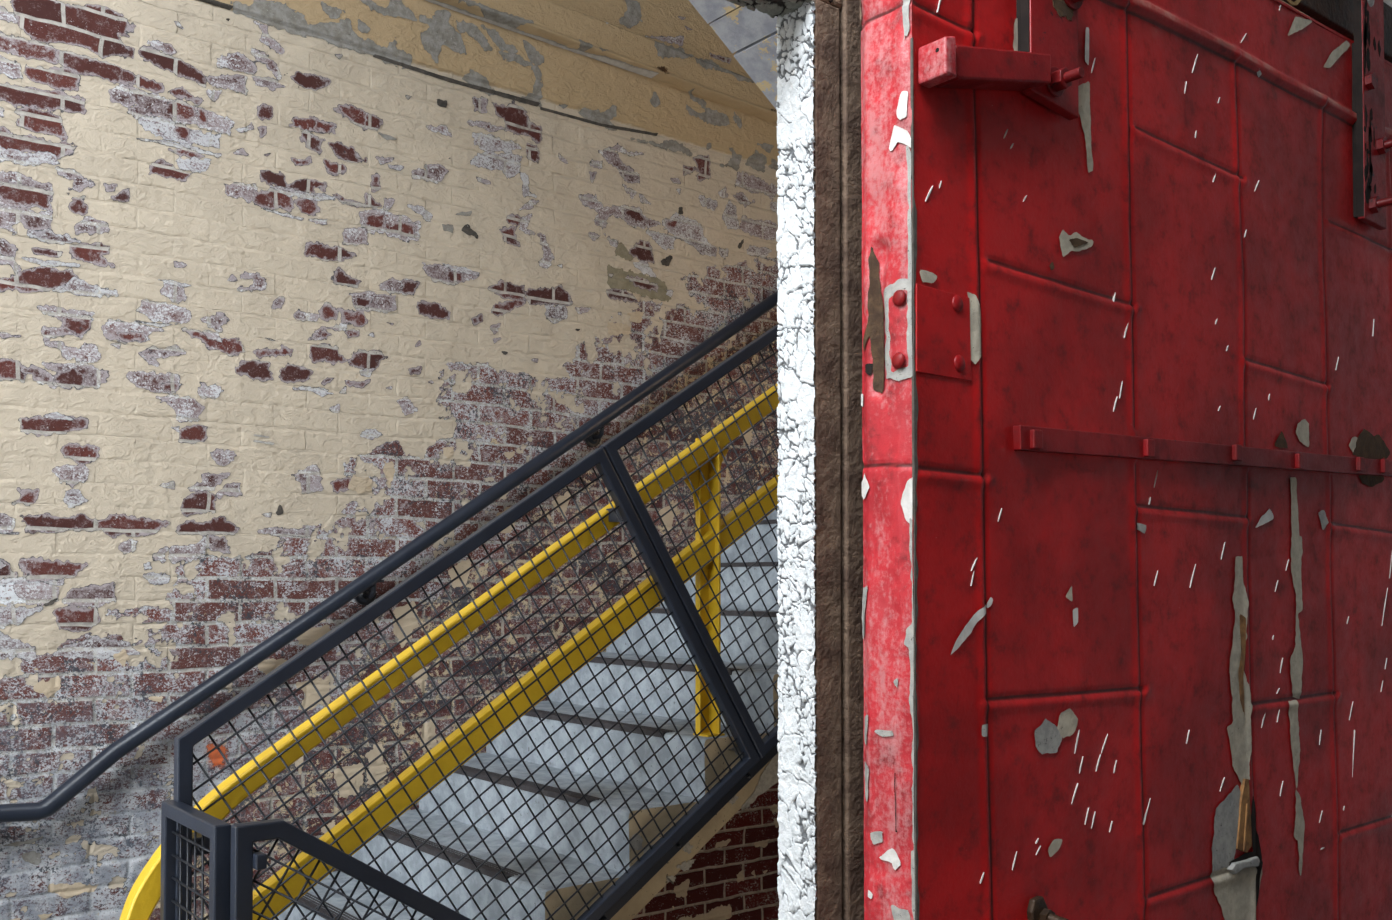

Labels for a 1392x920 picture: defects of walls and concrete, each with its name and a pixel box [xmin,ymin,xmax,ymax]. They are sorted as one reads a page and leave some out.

peeling [726,0,815,18]
peeling [861,91,937,407]
peeling [0,0,780,920]
crack [776,0,833,920]
peeling [1034,708,1078,754]